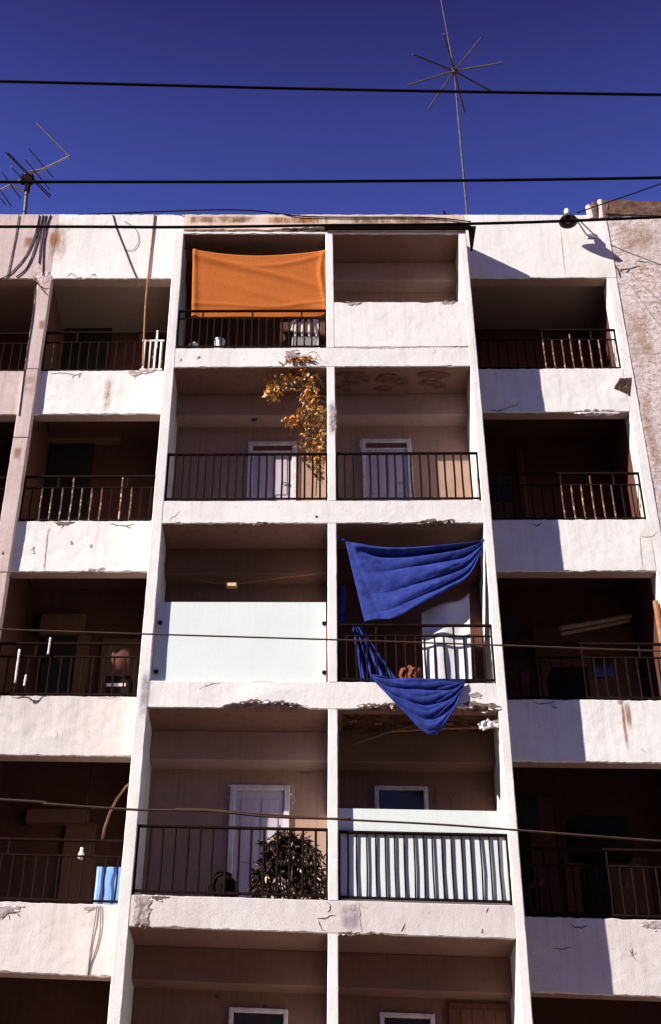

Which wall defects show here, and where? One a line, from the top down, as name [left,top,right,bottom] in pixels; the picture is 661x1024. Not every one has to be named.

spalling [614,377,632,396]
spalling [224,699,307,712]
spalling [442,692,501,731]
spalling [0,905,24,919]
spalling [133,894,169,928]
crack [317,902,366,931]